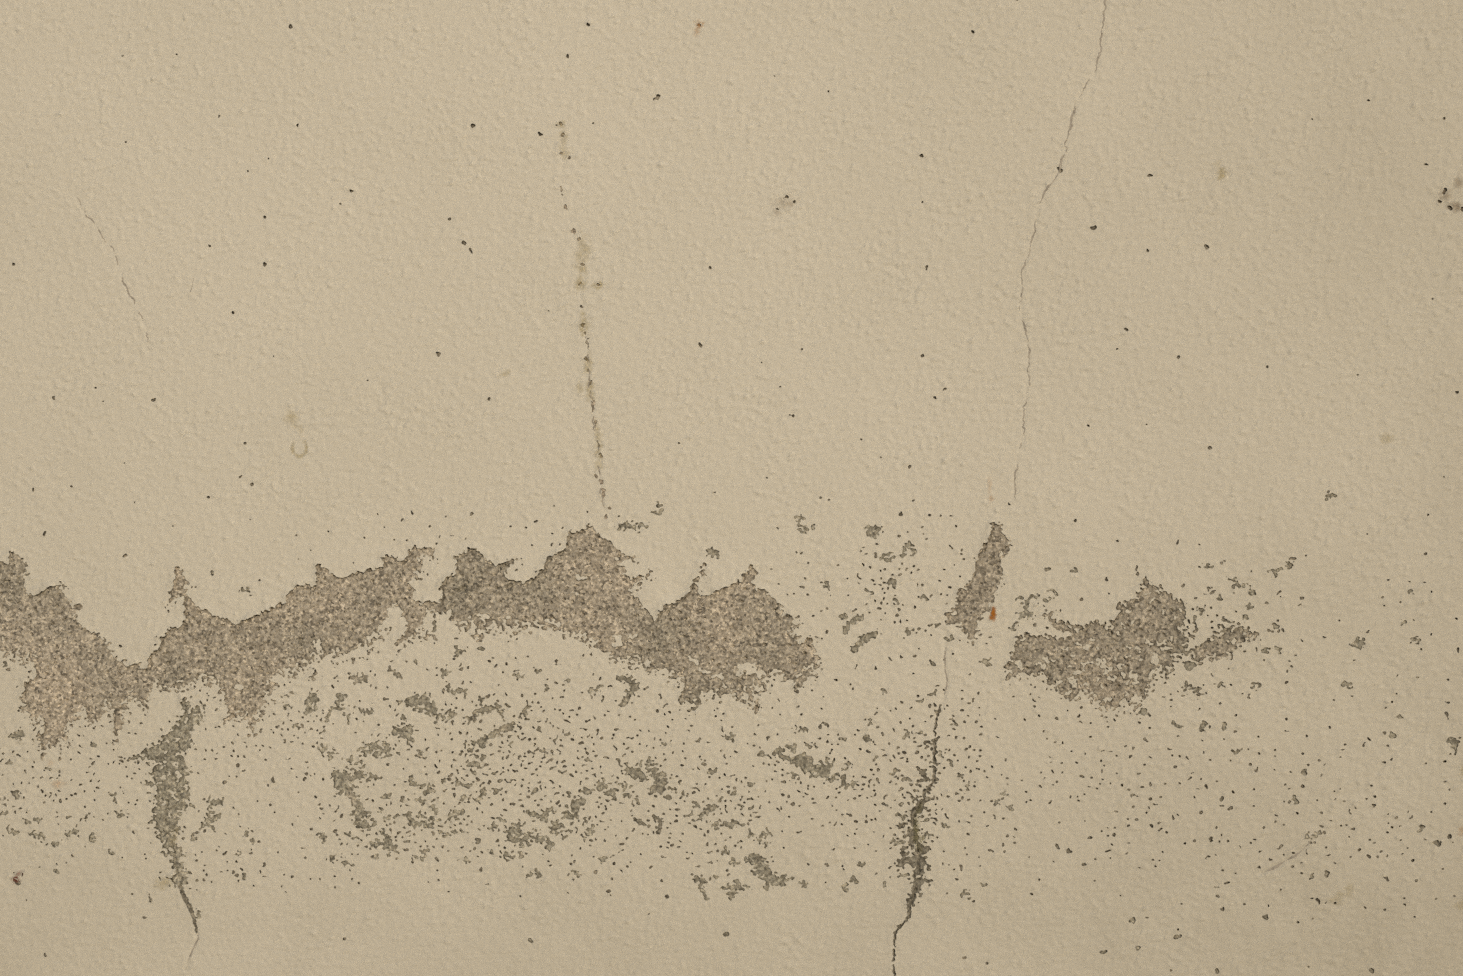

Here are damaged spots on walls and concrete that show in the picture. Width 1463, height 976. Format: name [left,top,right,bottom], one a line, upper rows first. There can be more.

crack [556,122,611,519]
crack [1014,0,1106,500]
peeling [0,501,878,901]
peeling [864,525,917,605]
crack [892,648,948,976]
peeling [934,522,1282,722]
peeling [1171,720,1227,732]